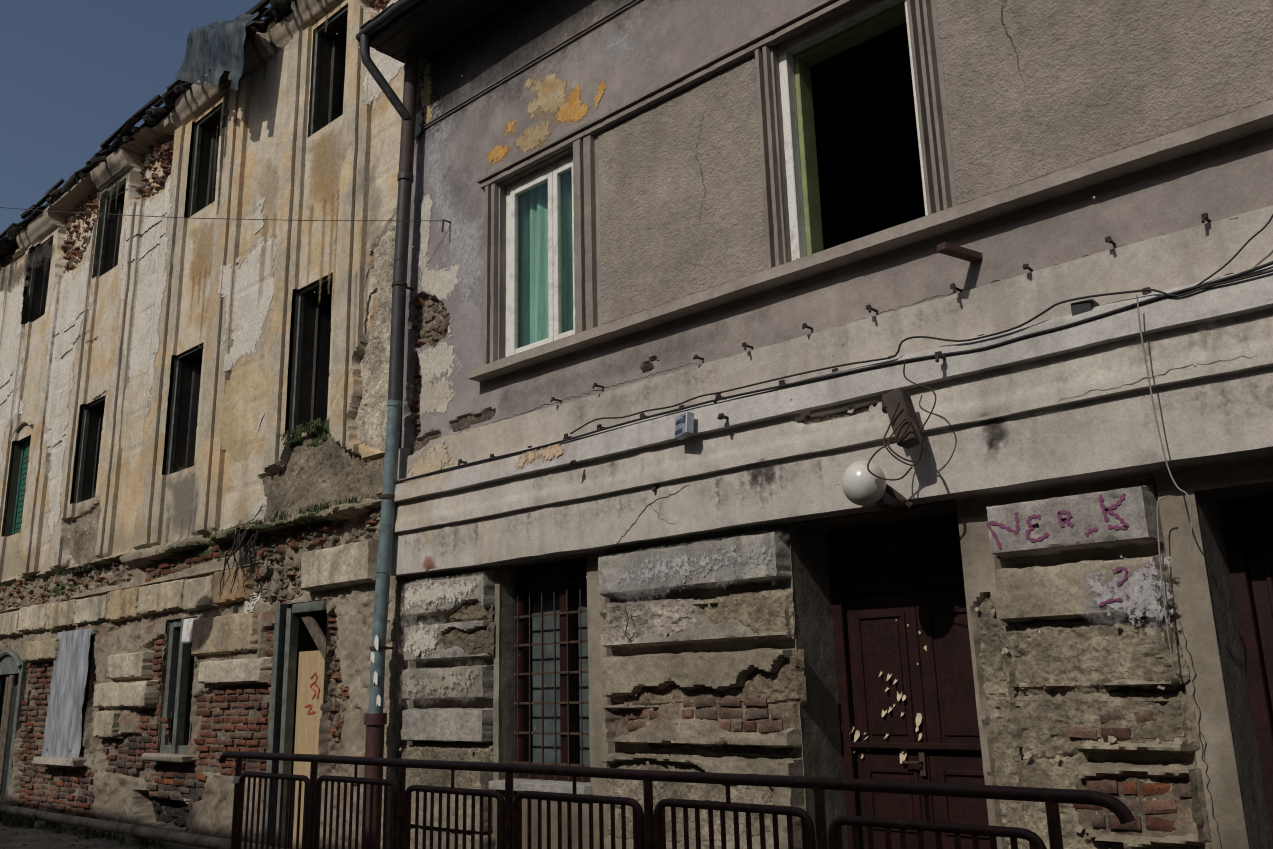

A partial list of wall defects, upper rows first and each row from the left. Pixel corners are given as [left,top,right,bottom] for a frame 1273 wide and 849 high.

crack [985,0,1025,87]
water stain [212,111,228,213]
water stain [307,134,339,290]
peeling [44,131,194,542]
spalling [0,196,397,613]
peeling [402,193,496,482]
crack [617,485,688,548]
water stain [984,419,1005,448]
spalling [16,628,274,819]
spalling [396,744,493,790]
spalling [604,544,807,843]
spalling [974,552,1212,849]